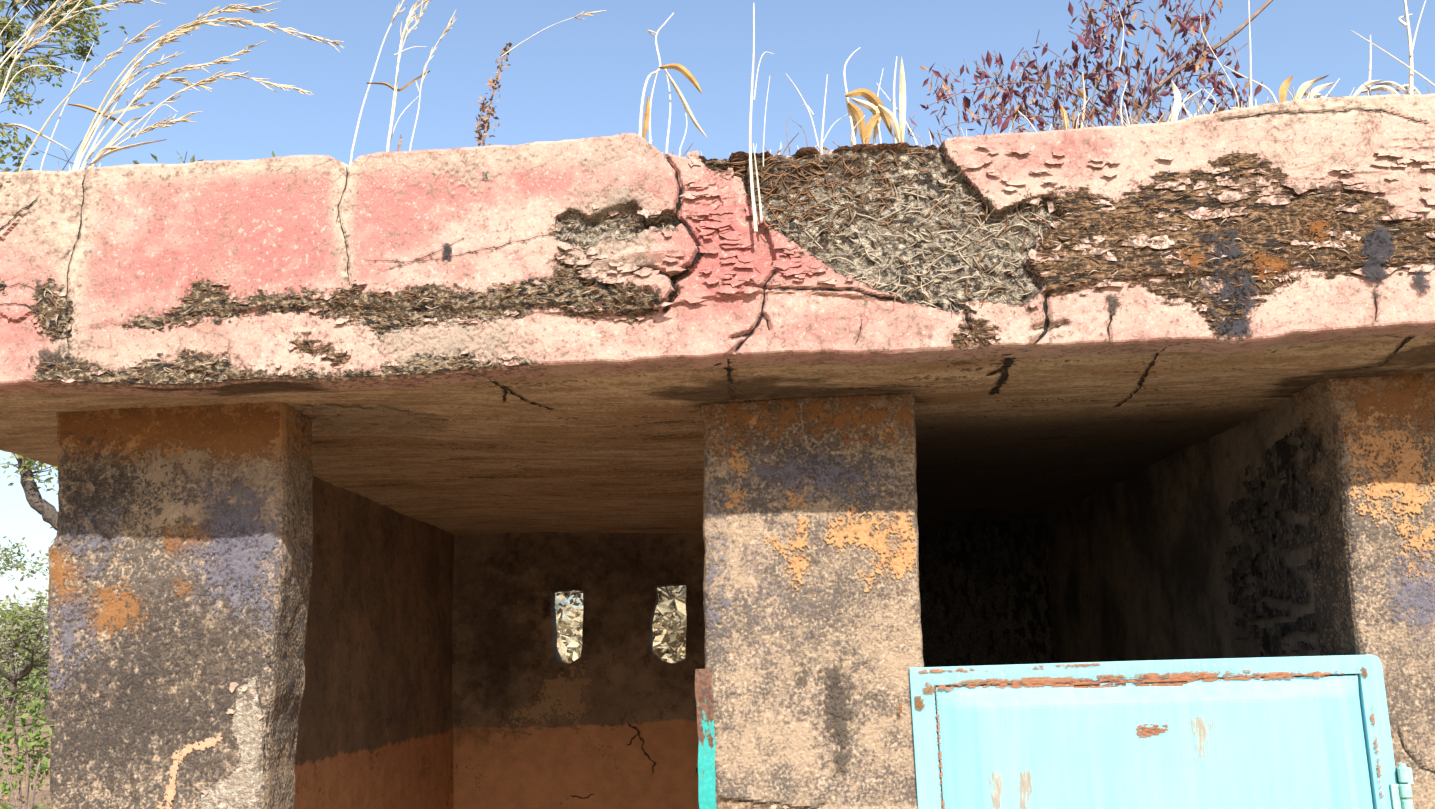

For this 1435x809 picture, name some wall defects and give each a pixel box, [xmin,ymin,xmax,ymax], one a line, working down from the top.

crack [0,176,85,350]
crack [336,167,555,277]
spalling [29,144,1435,385]
crack [464,373,553,410]
crack [963,295,1065,395]
crack [1107,309,1197,408]
spalling [157,677,264,809]
crack [627,723,656,774]
rust [898,663,1368,809]
crack [1398,725,1435,773]